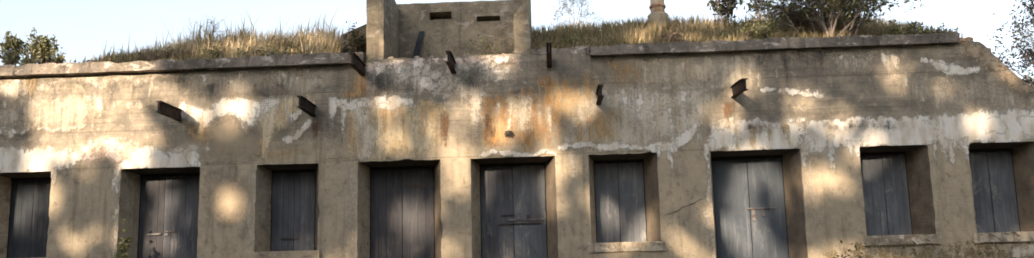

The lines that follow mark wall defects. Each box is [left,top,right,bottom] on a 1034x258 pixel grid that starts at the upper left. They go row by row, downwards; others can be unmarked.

corrosion [481,76,597,149]
peeling [80,137,142,165]